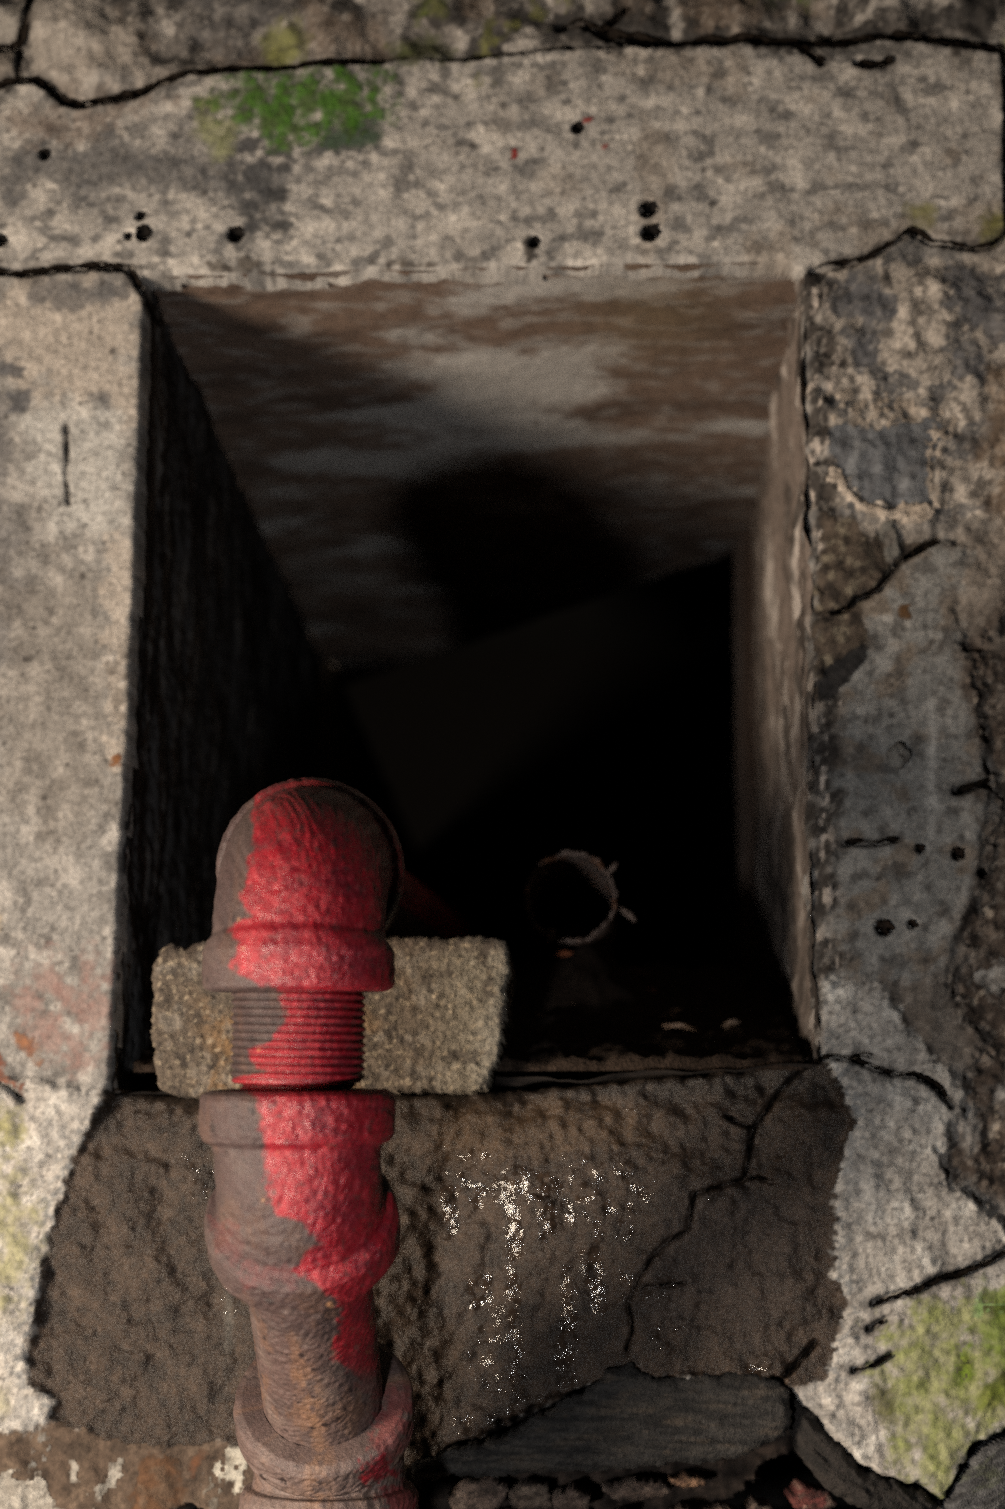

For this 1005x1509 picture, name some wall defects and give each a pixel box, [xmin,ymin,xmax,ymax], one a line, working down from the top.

crack [0,0,383,109]
crack [561,7,1005,94]
crack [813,226,1005,270]
crack [0,261,160,328]
crack [62,425,70,503]
crack [834,538,938,612]
crack [956,779,990,794]
crack [844,837,898,845]
crack [624,1053,954,1355]
crack [853,1251,1005,1371]
crack [781,1342,816,1379]